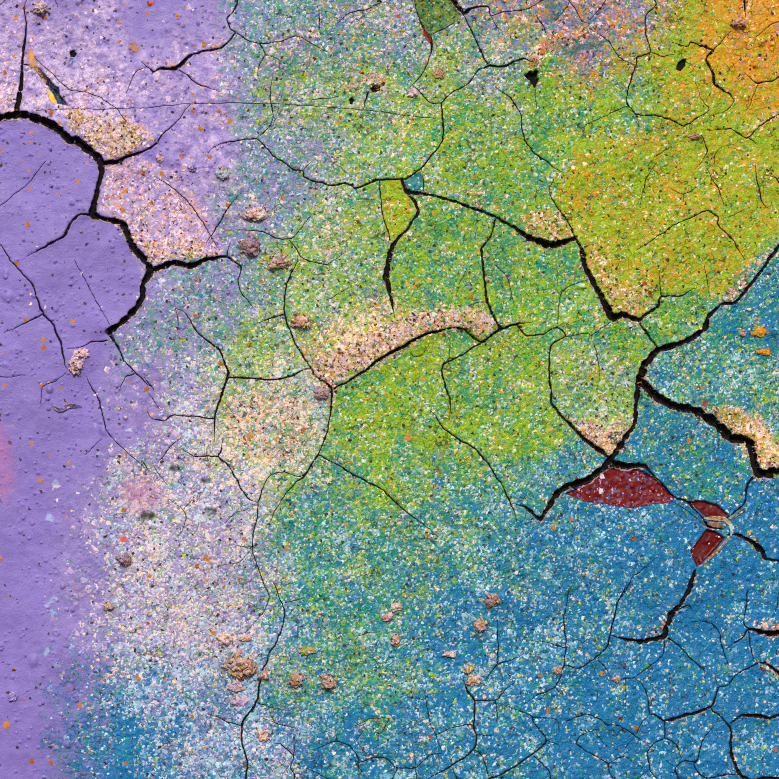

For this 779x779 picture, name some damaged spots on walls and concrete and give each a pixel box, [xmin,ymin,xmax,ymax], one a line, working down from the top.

crack [0,0,253,403]
crack [126,0,779,633]
crack [85,376,179,484]
spalling [566,468,749,567]
crack [208,582,300,779]
crack [307,557,779,779]